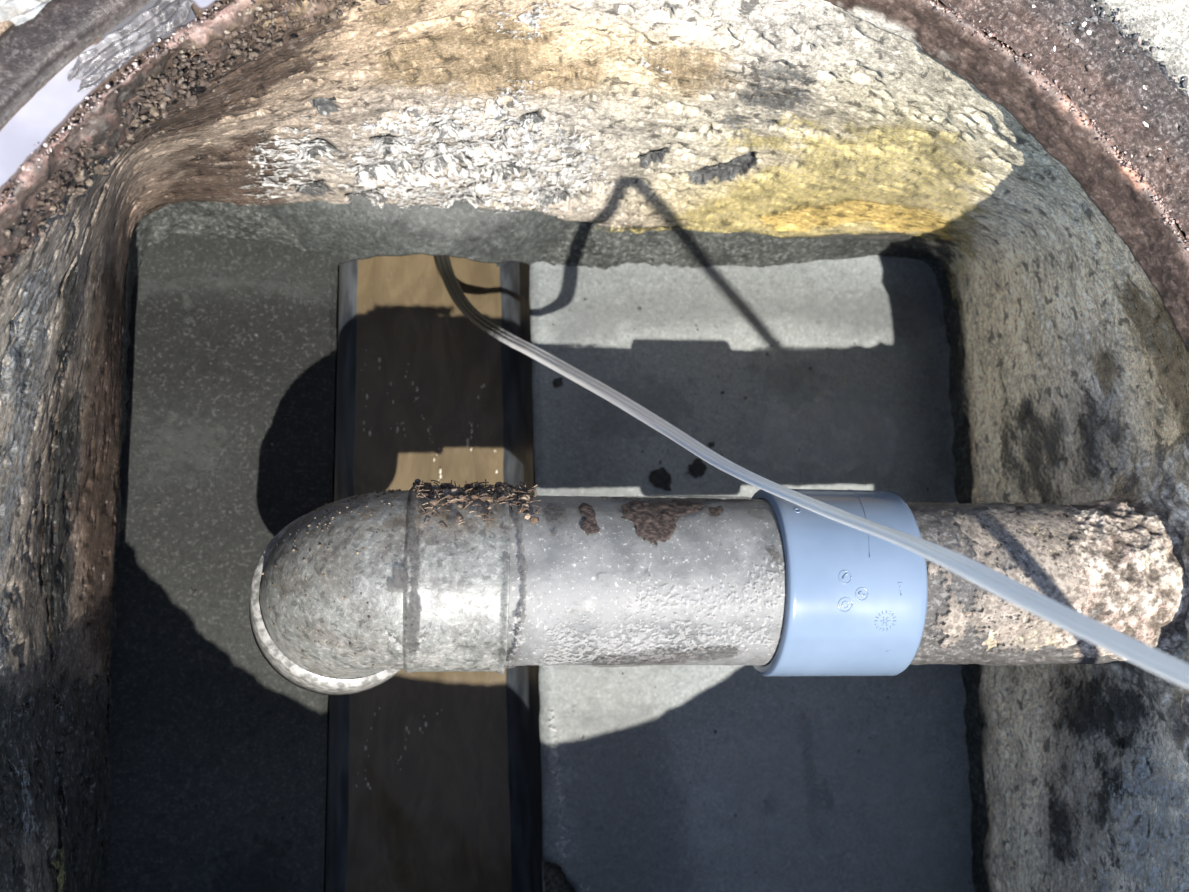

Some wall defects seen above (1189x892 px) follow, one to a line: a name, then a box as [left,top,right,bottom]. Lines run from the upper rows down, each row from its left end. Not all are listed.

leakage [489,3,566,40]
leakage [241,80,618,214]
leakage [677,60,990,299]
leakage [957,329,975,416]
leakage [1000,349,1124,504]
leakage [1118,283,1189,444]
leakage [0,261,112,892]
leakage [1047,666,1189,892]